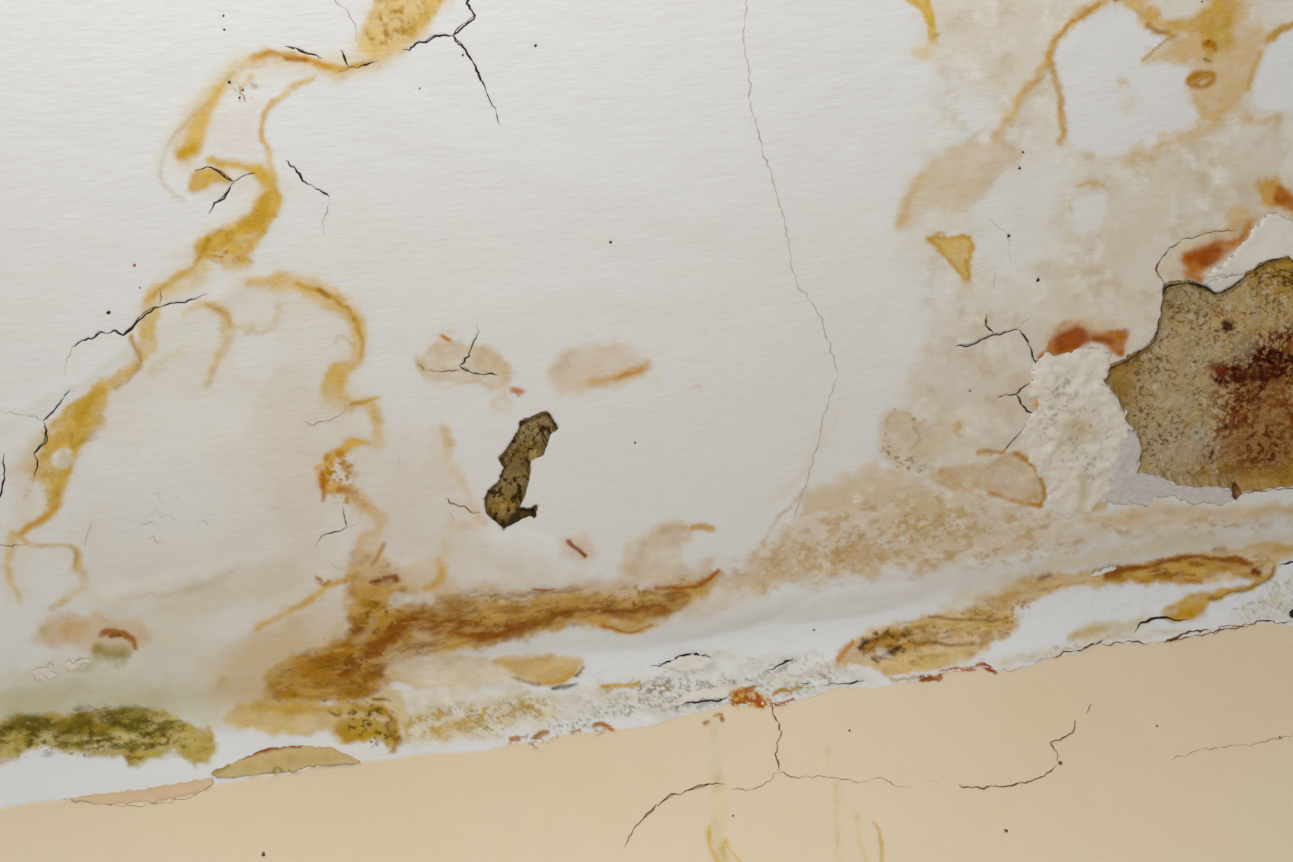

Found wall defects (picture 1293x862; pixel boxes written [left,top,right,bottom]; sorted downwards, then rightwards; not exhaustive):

crack [285,0,372,72]
crack [403,0,500,125]
corrosion [1150,171,1293,285]
crack [0,288,206,497]
damp [0,0,743,773]
damp [716,0,1293,679]
corrosion [1035,311,1133,361]
spalling [1021,211,1293,519]
spalling [485,411,558,529]
flaking render [987,624,1195,672]
flaking render [1220,564,1293,631]
crack [624,702,1091,847]